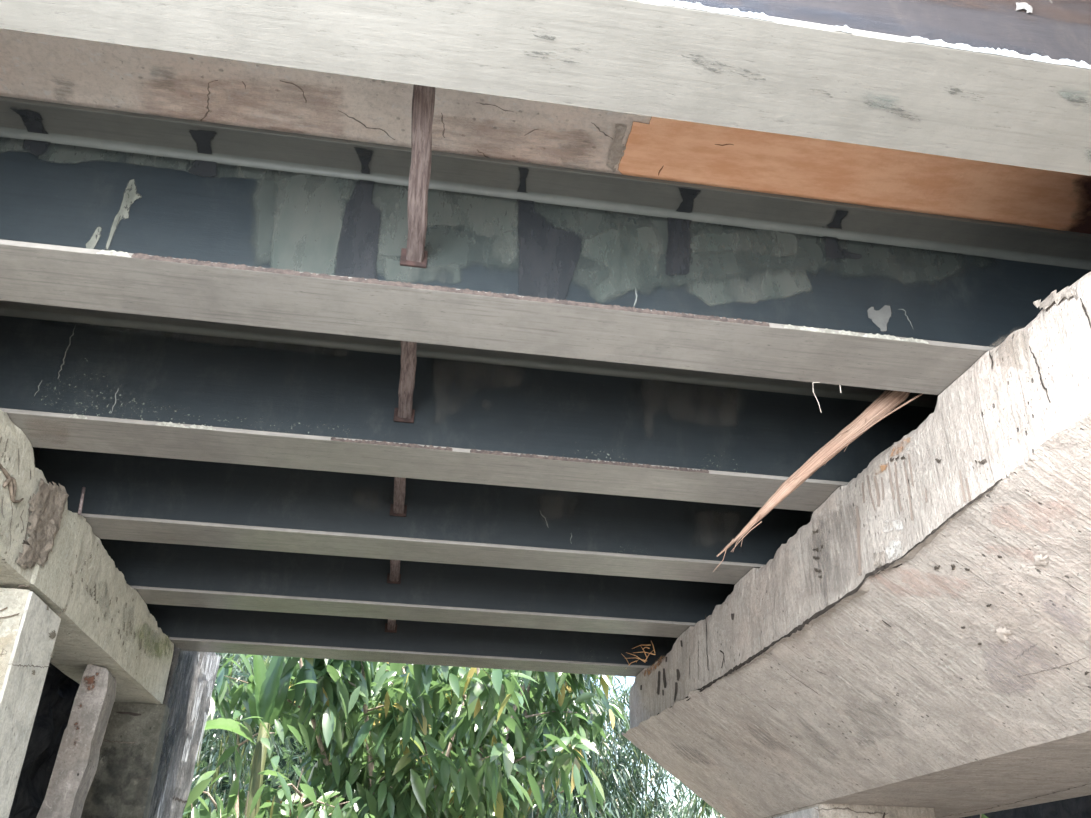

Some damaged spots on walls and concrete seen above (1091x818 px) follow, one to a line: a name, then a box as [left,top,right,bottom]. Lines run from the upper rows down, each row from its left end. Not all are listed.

crack [201,80,246,121]
crack [340,111,395,140]
peeling [86,179,142,258]
peeling [783,305,929,344]
crack [1029,346,1050,402]
spalling [4,479,69,570]
crack [657,479,1002,715]
crack [814,807,888,818]